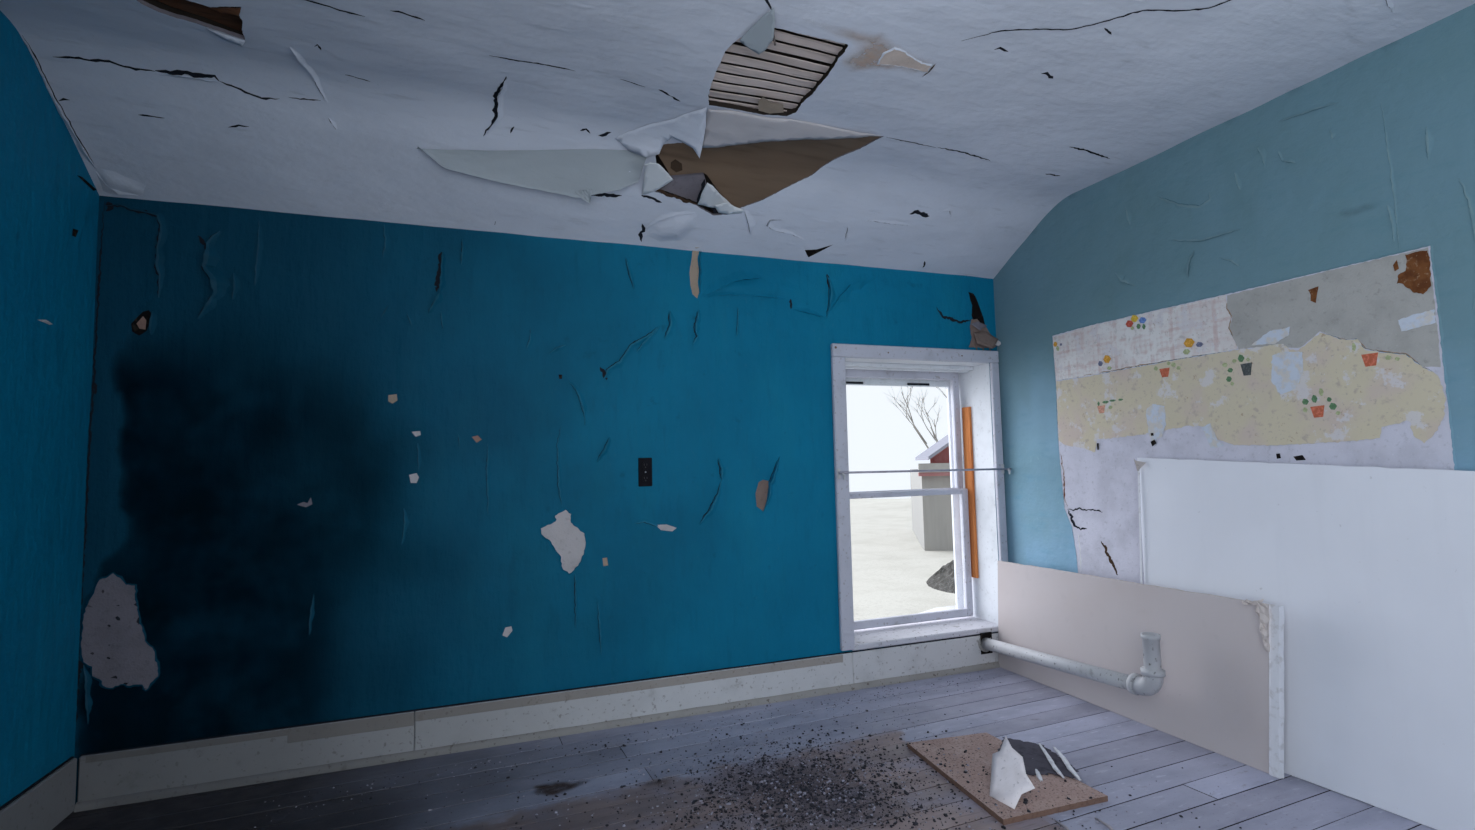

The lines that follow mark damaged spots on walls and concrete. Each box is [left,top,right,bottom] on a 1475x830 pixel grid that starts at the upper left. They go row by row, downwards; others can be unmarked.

crack [57,56,321,127]
crack [483,55,573,137]
spalling [615,8,881,214]
flaking render [877,47,935,76]
crack [963,0,1231,52]
crack [637,224,645,242]
crack [910,209,929,217]
spalling [131,310,157,335]
peeling [540,426,608,630]
peeling [755,457,780,512]
crack [1060,453,1118,575]
peeling [79,572,160,723]